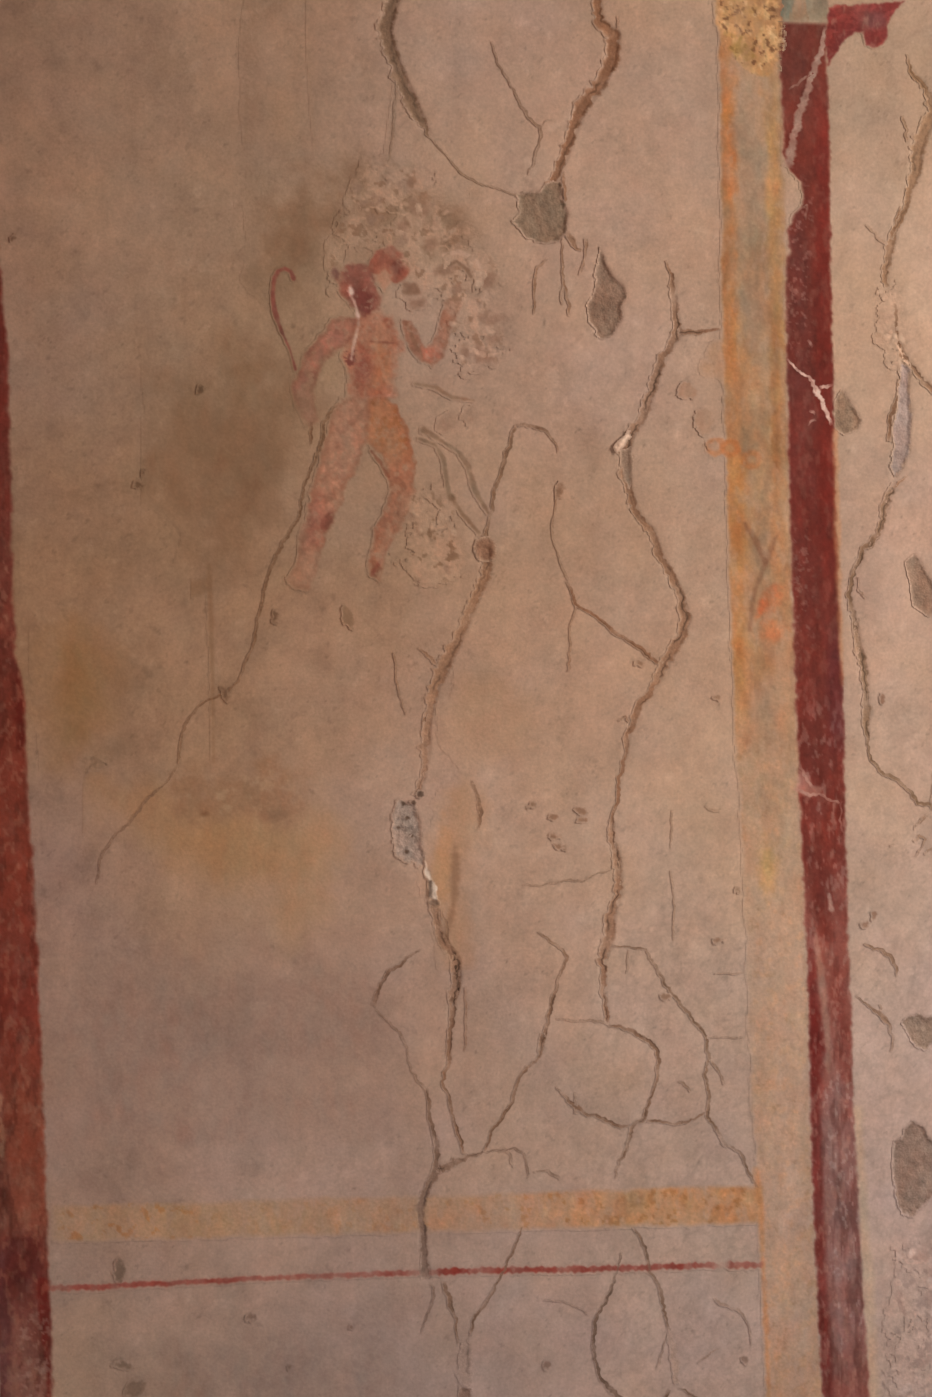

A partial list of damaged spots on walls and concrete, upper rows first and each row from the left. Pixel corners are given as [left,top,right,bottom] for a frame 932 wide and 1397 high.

peeling [324,154,512,380]
crack [375,0,623,316]
crack [866,54,932,442]
crack [96,402,340,885]
spalling [395,789,425,831]
flaking render [404,849,441,909]
crack [371,260,759,1397]
crack [845,475,932,857]